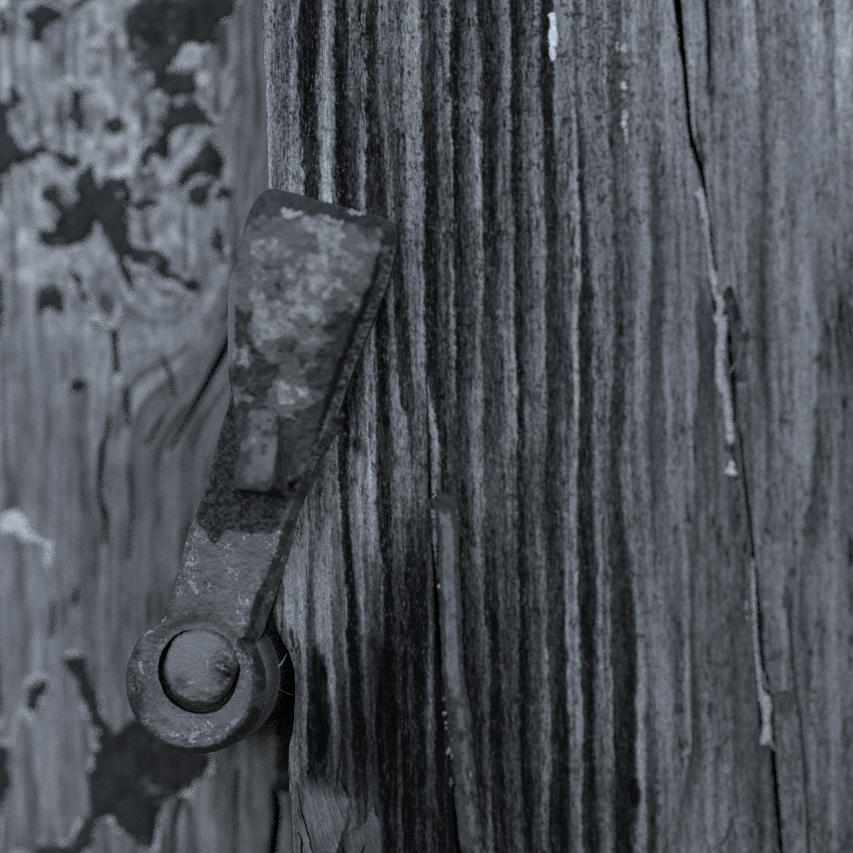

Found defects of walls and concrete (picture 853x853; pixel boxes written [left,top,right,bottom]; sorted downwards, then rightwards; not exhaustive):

peeling [0,0,244,335]
peeling [0,510,54,567]
peeling [63,377,87,394]
peeling [237,349,250,368]
corrosion [197,392,296,543]
crack [673,0,784,853]
peeling [0,672,54,848]
peeling [11,656,218,853]
peeling [274,698,295,793]